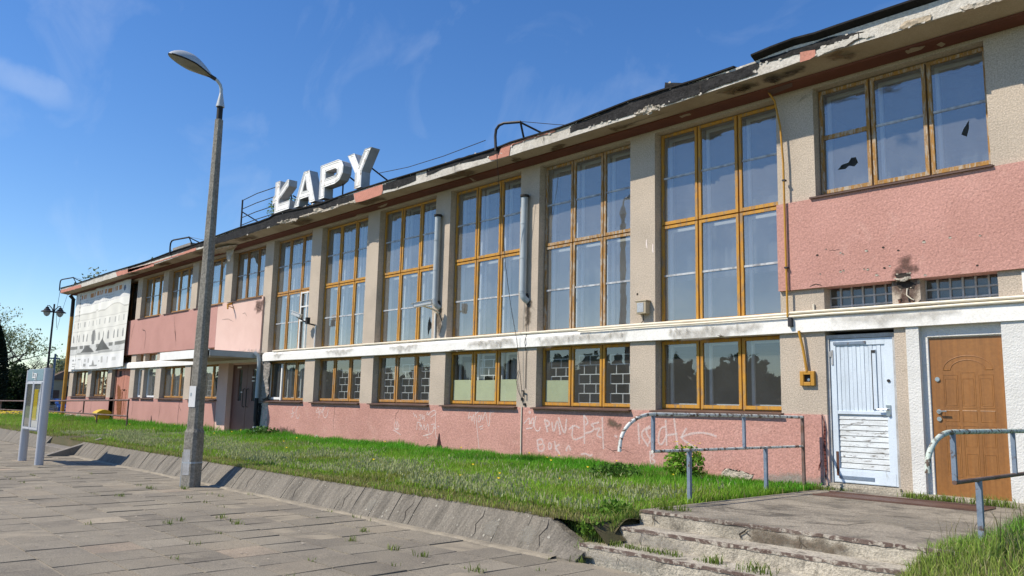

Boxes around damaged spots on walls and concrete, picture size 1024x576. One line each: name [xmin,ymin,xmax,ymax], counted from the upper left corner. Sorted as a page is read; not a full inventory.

peeling [897,14,932,30]
leakage [827,51,853,60]
peeling [569,32,874,133]
leakage [719,66,805,95]
peeling [382,130,555,190]